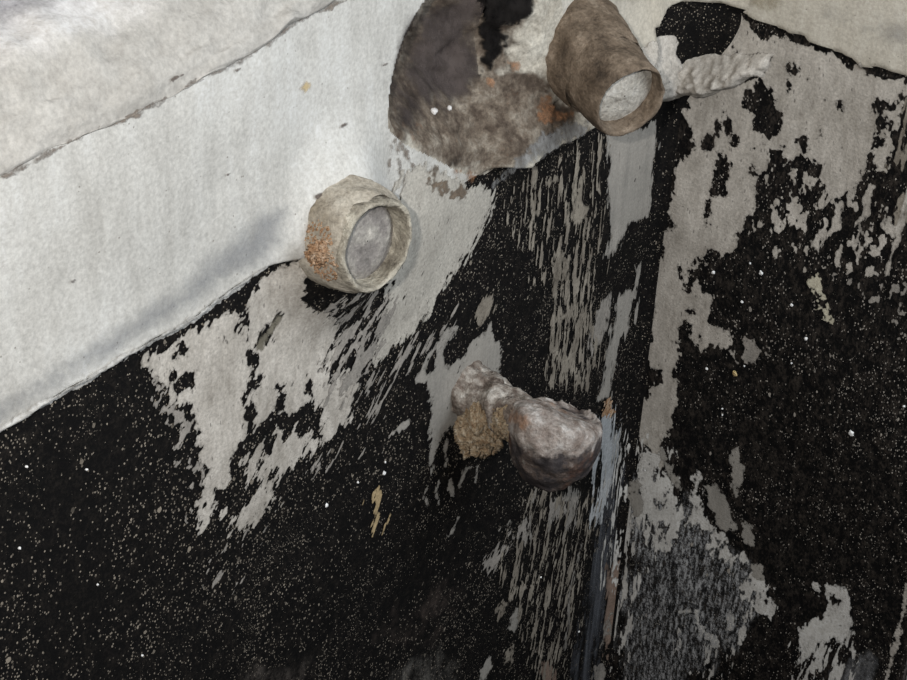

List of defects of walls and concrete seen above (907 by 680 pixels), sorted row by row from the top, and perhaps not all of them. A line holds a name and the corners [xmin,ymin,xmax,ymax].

rust [303,219,339,282]
peeling [141,0,660,589]
peeling [639,13,907,491]
peeling [704,447,755,547]
peeling [479,486,613,680]
peeling [751,564,765,581]
peeling [885,583,907,680]